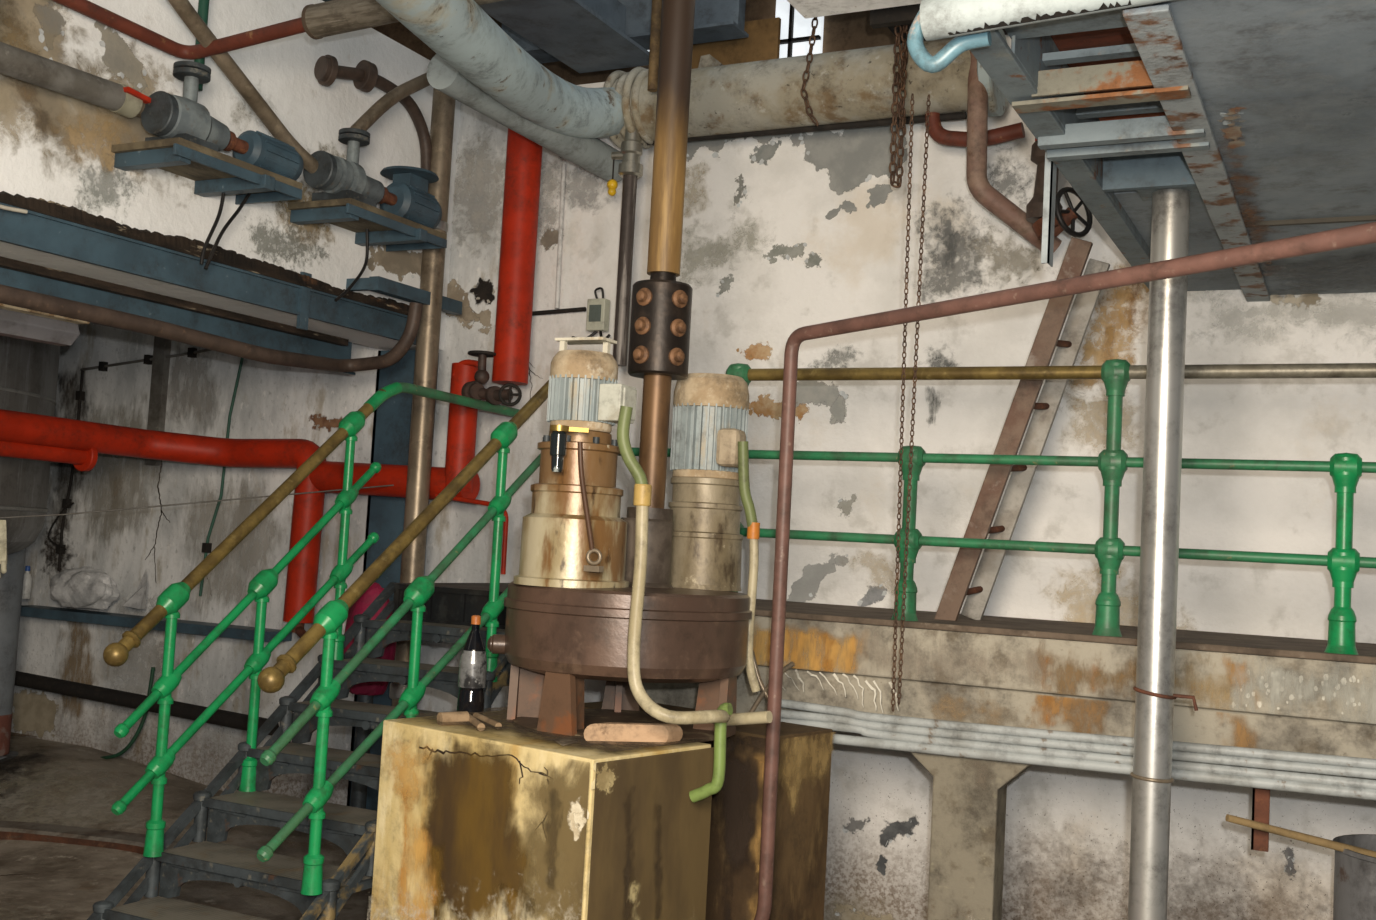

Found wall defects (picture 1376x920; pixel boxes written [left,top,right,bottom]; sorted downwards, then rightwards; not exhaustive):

water stain [0,0,159,96]
water stain [0,74,156,210]
peeling [687,125,908,220]
corrosion [1227,138,1268,243]
peeling [763,243,822,268]
peeling [749,381,848,424]
peeling [787,554,848,602]
corrosion [1034,652,1136,734]
crack [419,746,549,784]
water stain [778,732,834,808]
water stain [423,742,557,920]
peeling [842,817,919,875]